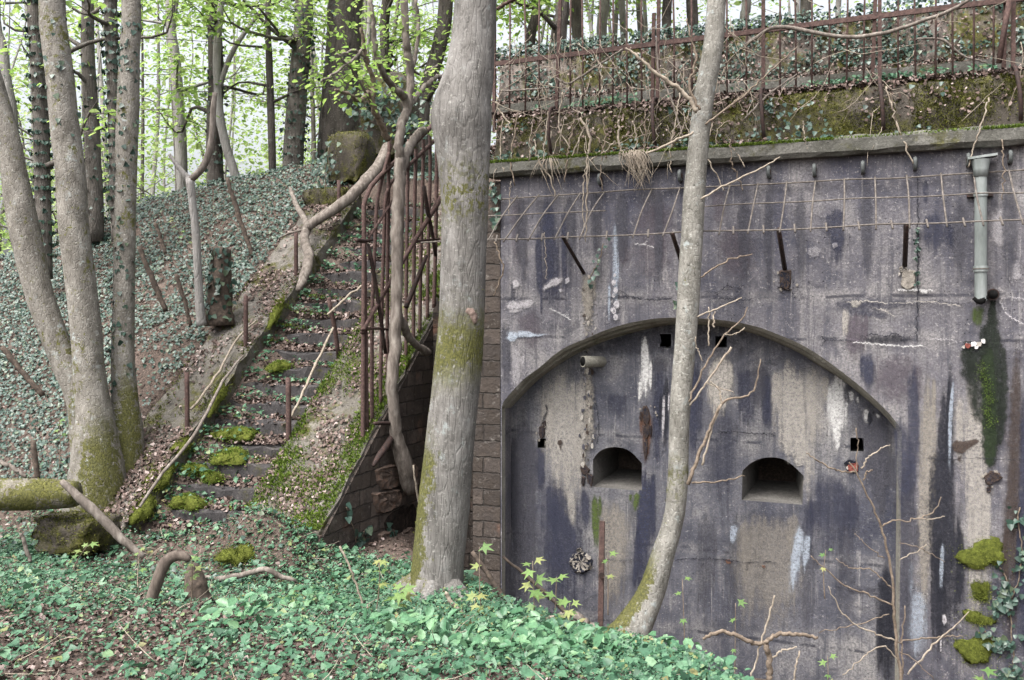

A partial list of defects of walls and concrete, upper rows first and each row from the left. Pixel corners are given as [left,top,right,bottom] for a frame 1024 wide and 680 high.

water stain [501,197,574,381]
water stain [591,191,601,254]
water stain [608,192,669,320]
water stain [600,328,675,459]
water stain [511,374,656,605]
water stain [689,298,991,678]